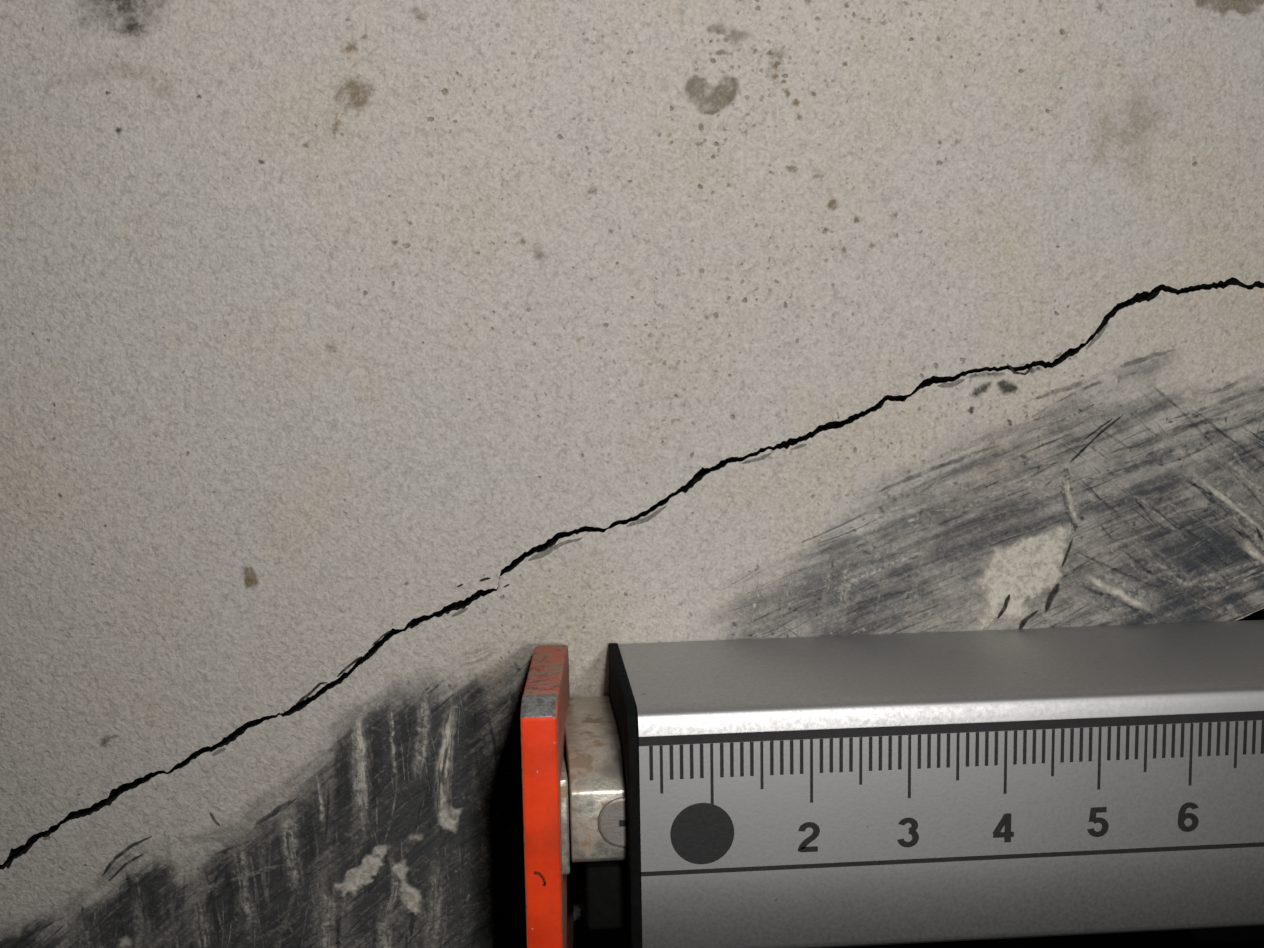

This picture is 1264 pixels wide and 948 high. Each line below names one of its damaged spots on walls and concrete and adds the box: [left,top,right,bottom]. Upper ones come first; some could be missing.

crack [0,277,1264,870]